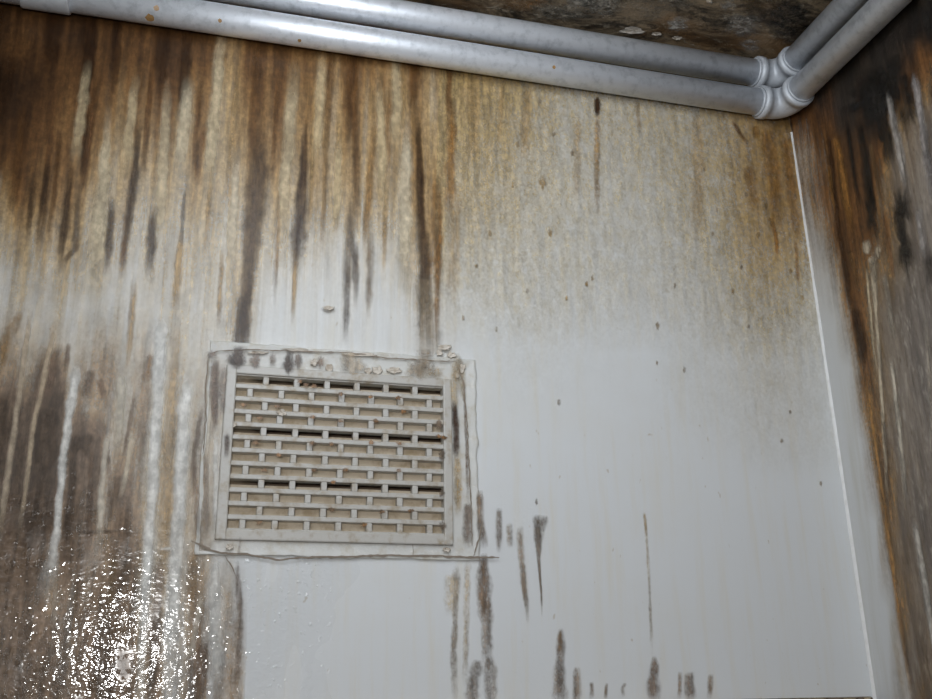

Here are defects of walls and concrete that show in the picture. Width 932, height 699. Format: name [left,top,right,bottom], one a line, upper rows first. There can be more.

corrosion [204,0,748,86]
corrosion [0,2,613,343]
corrosion [209,352,226,420]
corrosion [228,347,245,365]
corrosion [270,353,301,372]
corrosion [615,0,932,643]
water stain [863,242,906,487]
water stain [0,325,242,699]
water stain [452,404,485,540]
water stain [450,558,494,699]
water stain [534,518,544,603]
water stain [555,632,579,698]